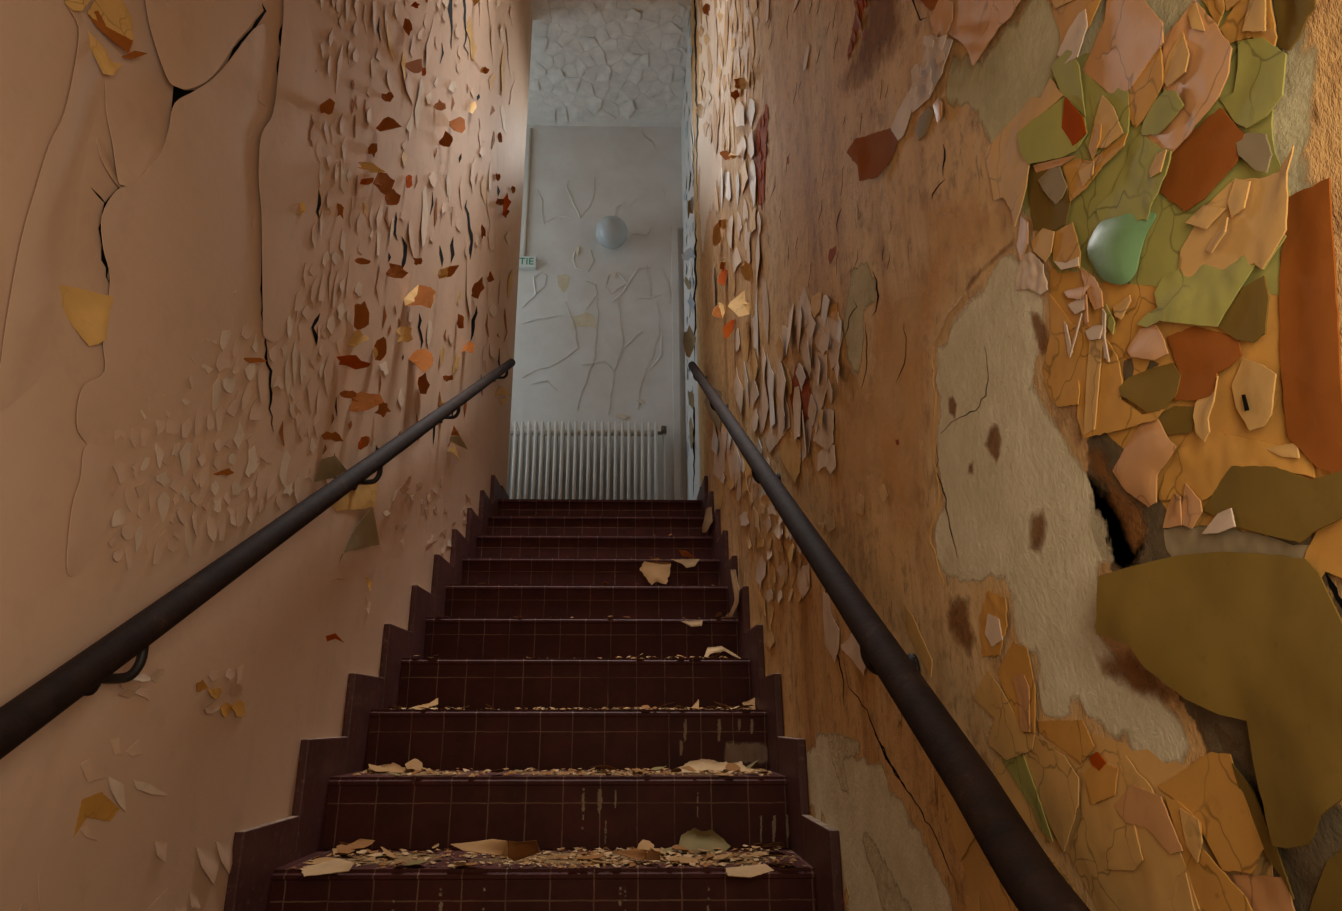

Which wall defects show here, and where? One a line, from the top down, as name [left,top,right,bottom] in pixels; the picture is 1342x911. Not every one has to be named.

peeling [60,0,516,582]
peeling [695,0,1018,911]
flaking render [847,0,1342,911]
peeling [640,550,699,585]
peeling [682,569,739,627]
peeling [668,646,740,658]
peeling [575,828,798,878]